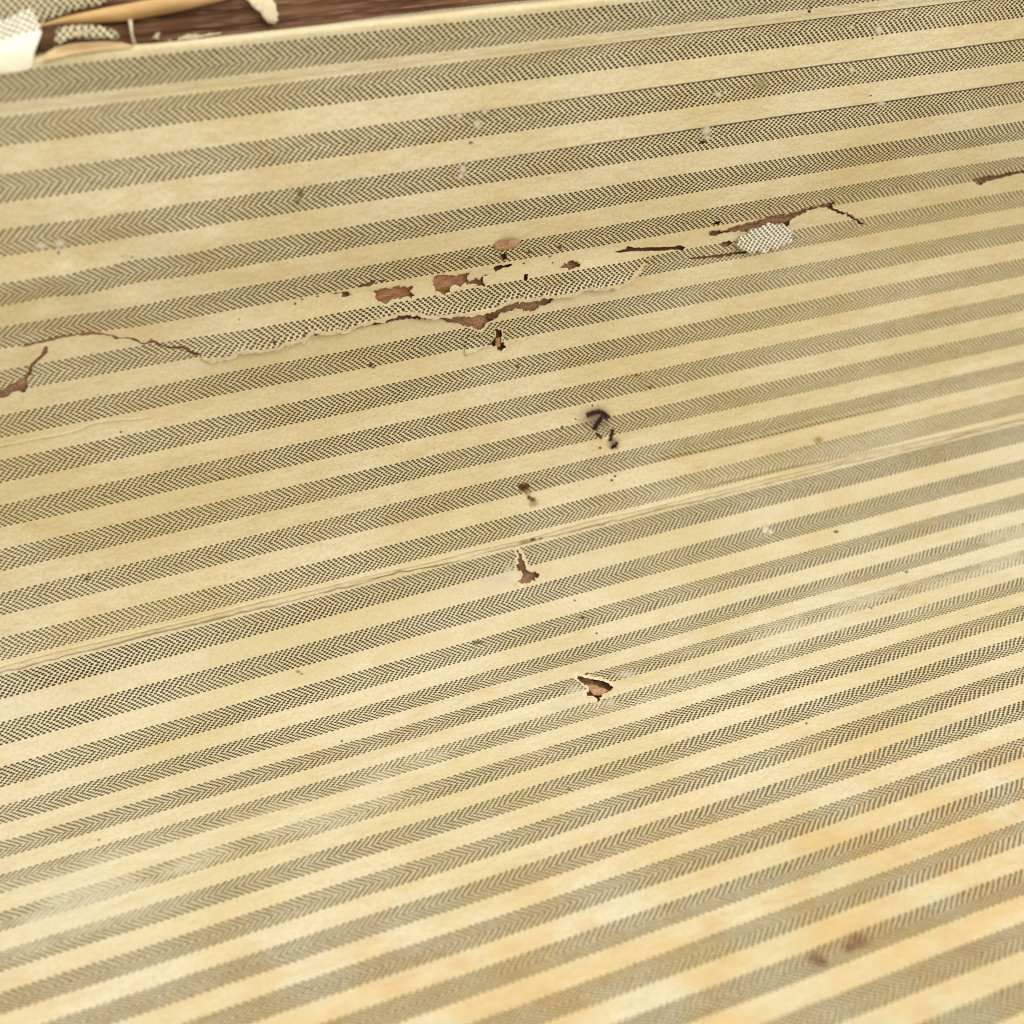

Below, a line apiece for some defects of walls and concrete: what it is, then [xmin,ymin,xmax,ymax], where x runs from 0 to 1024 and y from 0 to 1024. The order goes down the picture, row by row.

crack [0,332,199,398]